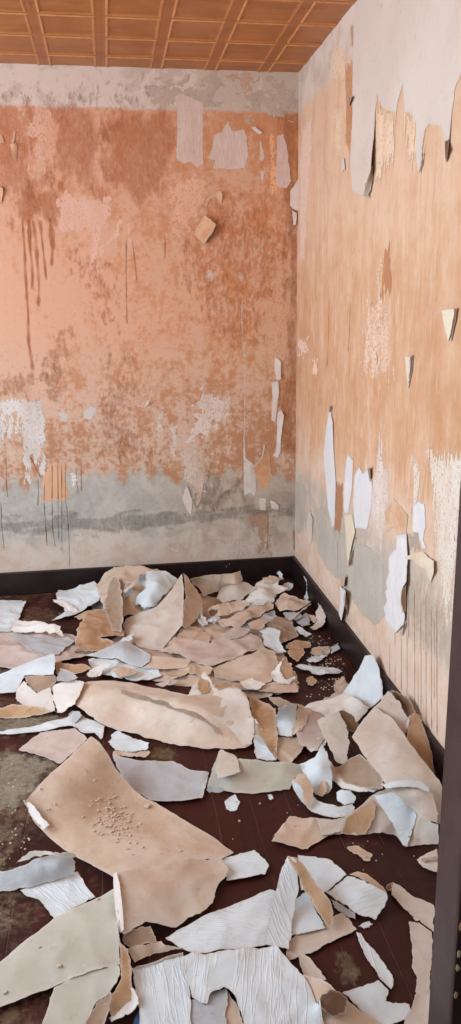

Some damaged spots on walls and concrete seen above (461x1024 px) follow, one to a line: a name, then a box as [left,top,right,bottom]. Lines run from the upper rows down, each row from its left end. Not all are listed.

damp [0,115,57,350]
flaking render [141,70,299,196]